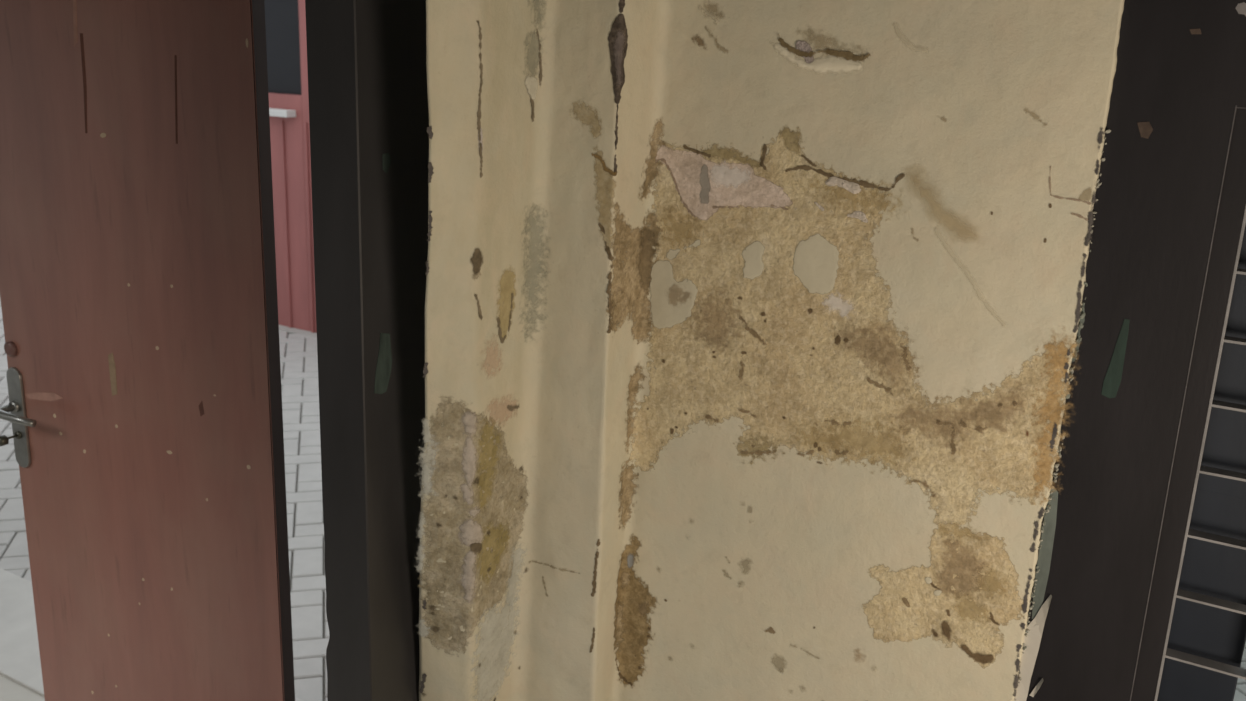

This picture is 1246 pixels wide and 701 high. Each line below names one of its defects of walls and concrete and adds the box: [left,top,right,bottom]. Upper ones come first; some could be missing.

spalling [608,14,628,104]
spalling [772,31,870,73]
spalling [1049,166,1091,221]
peeling [629,128,1073,701]
peeling [417,397,528,654]